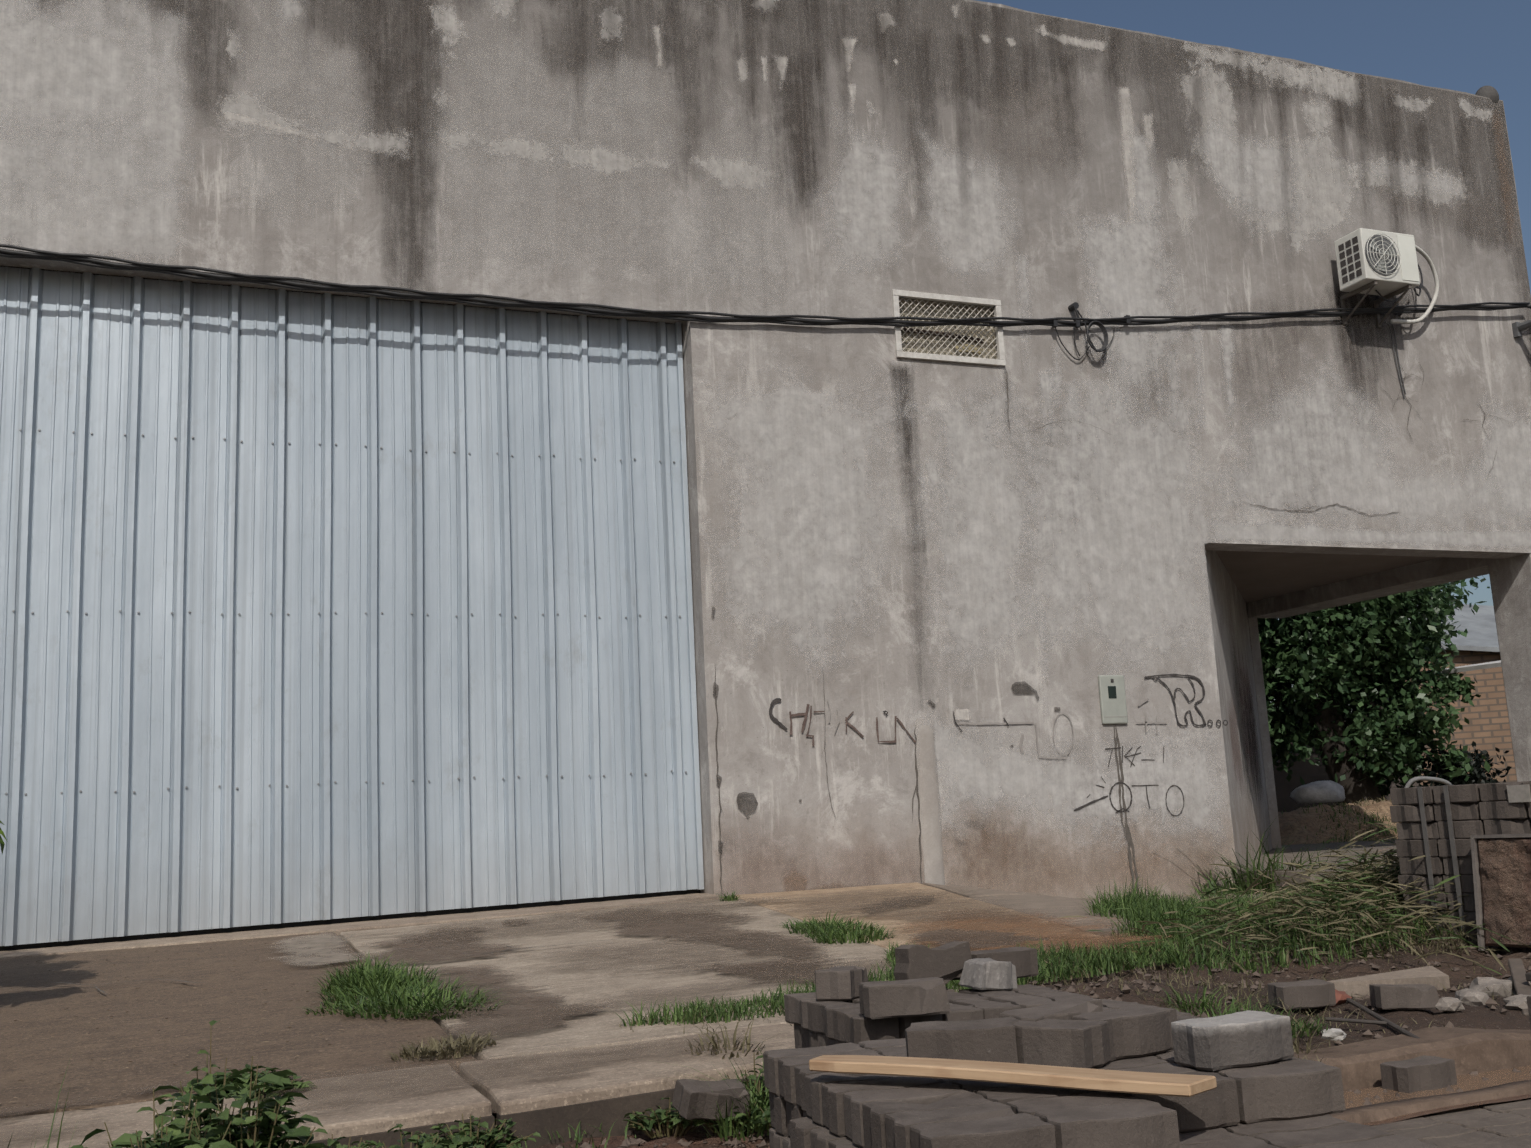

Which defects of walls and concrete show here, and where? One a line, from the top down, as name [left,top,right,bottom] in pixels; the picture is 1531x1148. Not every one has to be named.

leakage [0,0,234,256]
leakage [284,0,439,289]
leakage [543,0,700,150]
leakage [715,0,1531,667]
crack [1231,498,1395,516]
leakage [934,721,1219,830]